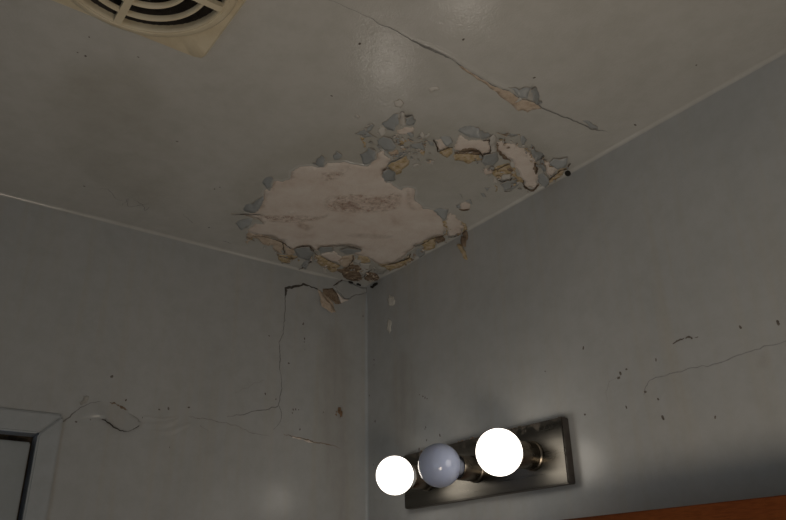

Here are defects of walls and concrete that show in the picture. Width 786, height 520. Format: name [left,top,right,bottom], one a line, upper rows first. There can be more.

crack [329,0,603,131]
peeling [232,148,473,313]
peeling [433,126,571,197]
crack [227,283,338,448]